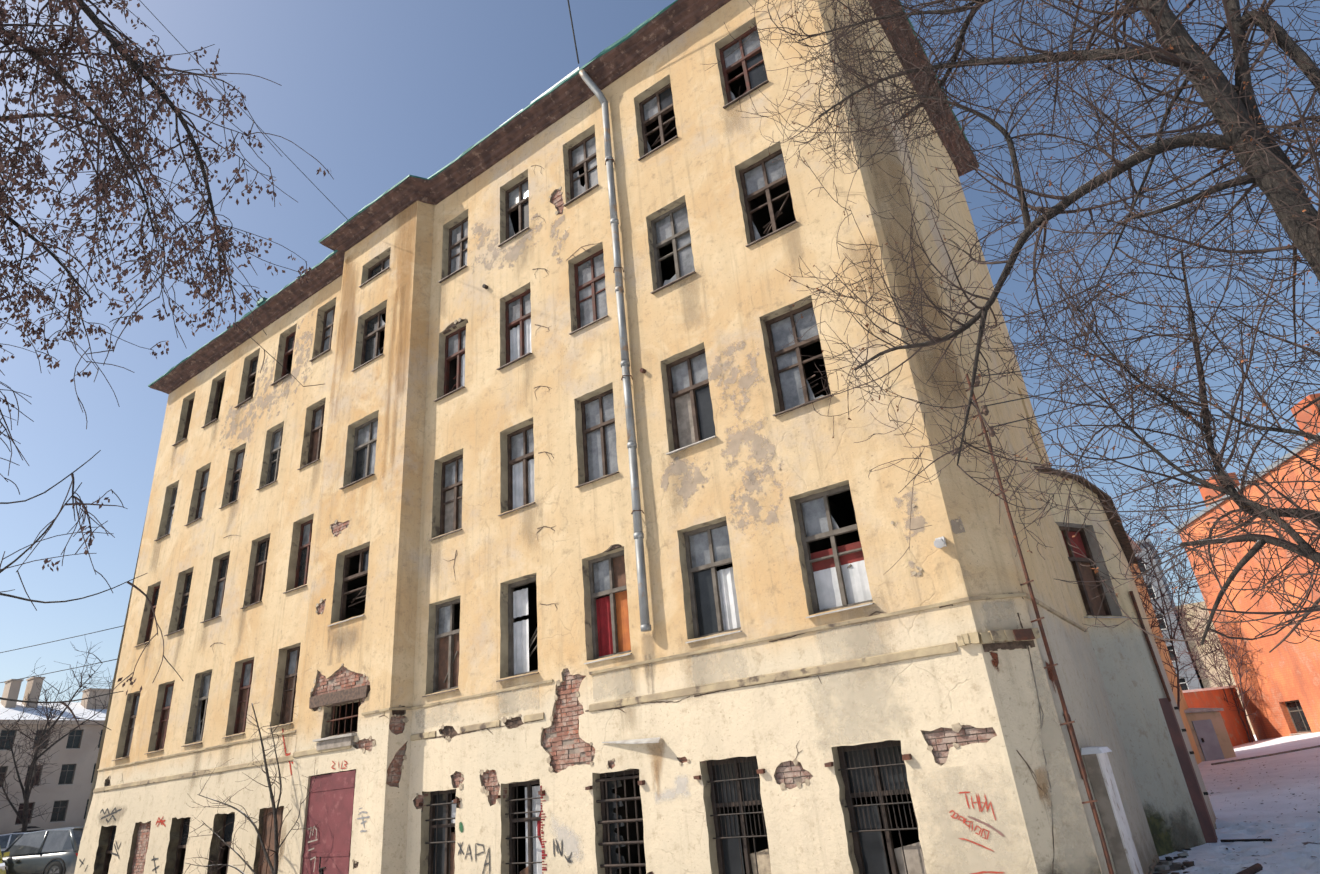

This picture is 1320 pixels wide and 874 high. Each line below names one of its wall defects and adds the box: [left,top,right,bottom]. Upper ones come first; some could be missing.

peeling [471,186,569,274]
peeling [708,342,782,530]
peeling [661,458,708,507]
spalling [310,663,370,712]
spalling [352,736,376,754]
spalling [386,705,409,788]
spalling [502,714,523,729]
spalling [540,668,615,774]
spalling [921,723,997,766]
spalling [413,793,428,811]
spalling [450,769,508,808]
spalling [774,759,813,790]